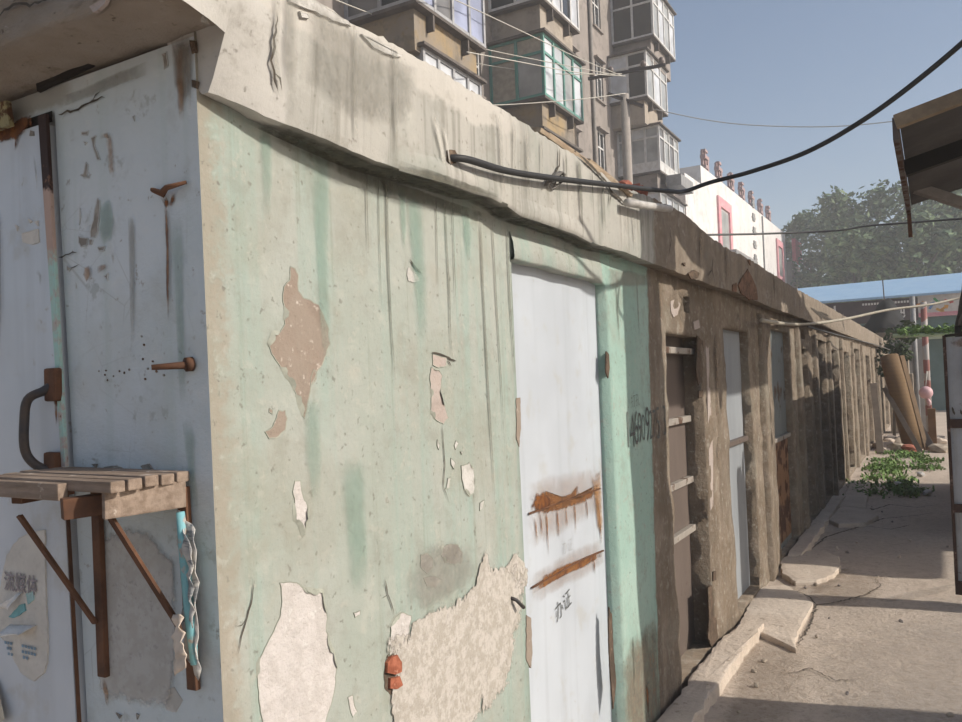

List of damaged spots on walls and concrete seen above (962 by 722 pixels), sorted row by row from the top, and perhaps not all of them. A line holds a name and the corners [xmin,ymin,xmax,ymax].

crack [0,0,47,15]
crack [270,16,282,90]
crack [59,92,105,115]
leakage [268,132,620,344]
peeling [267,266,331,419]
leakage [481,237,500,432]
peeling [429,354,449,424]
peeling [292,480,309,538]
corrosion [532,477,602,538]
corrosion [539,553,596,588]
peeling [256,581,338,722]
peeling [384,553,533,722]